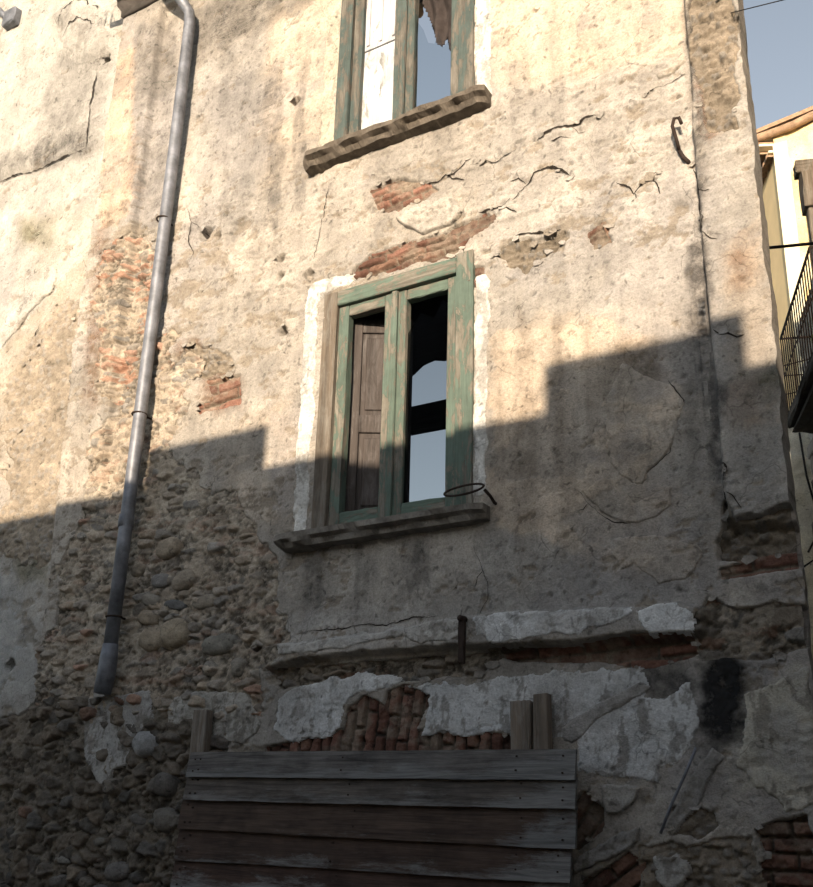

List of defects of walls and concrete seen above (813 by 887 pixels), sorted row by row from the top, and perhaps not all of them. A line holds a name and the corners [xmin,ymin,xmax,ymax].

spalling [657,0,742,133]
crack [3,75,97,181]
crack [537,111,604,141]
crack [426,150,515,184]
spalling [370,176,438,213]
crack [479,165,574,213]
crack [617,171,663,201]
crack [689,159,717,244]
crack [516,229,561,248]
spalling [0,213,813,887]
crack [299,616,433,634]